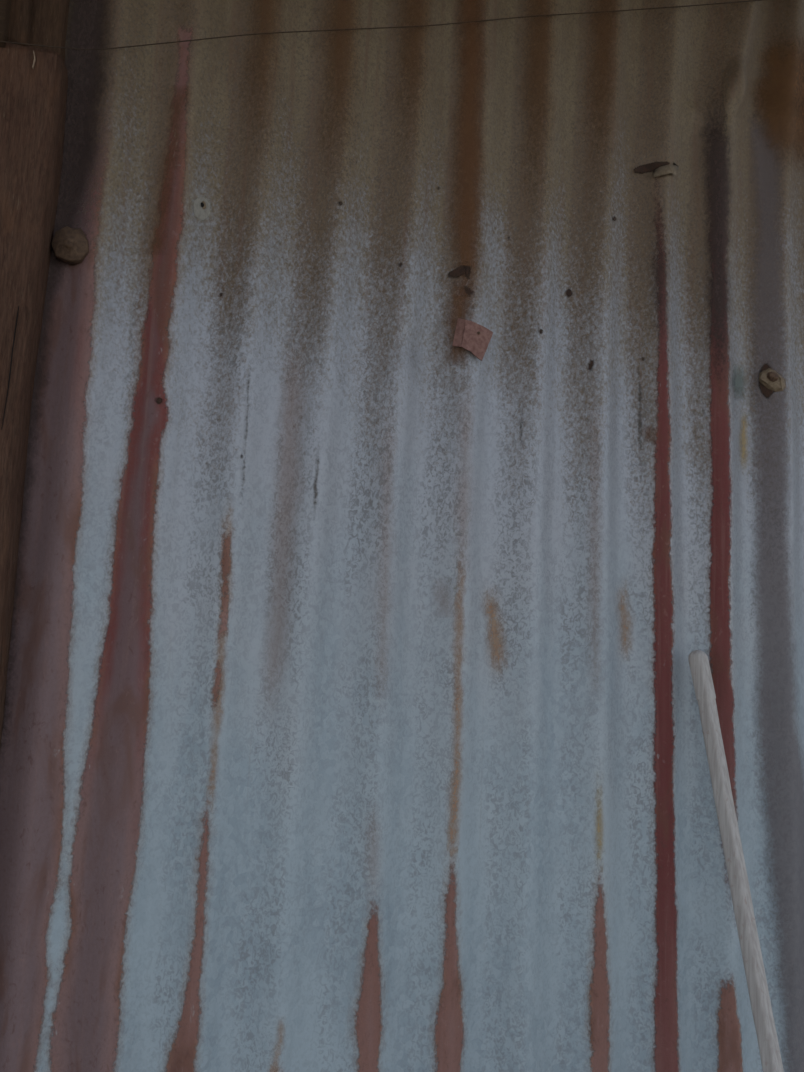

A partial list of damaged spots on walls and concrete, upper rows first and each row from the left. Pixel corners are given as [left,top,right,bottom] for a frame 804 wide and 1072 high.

corrosion [448,266,473,356]
corrosion [0,27,192,1072]
corrosion [647,199,679,1072]
corrosion [709,264,738,820]
corrosion [166,811,209,1072]
corrosion [355,904,383,1072]
corrosion [435,679,464,1072]
corrosion [589,878,610,1072]
corrosion [717,980,743,1072]